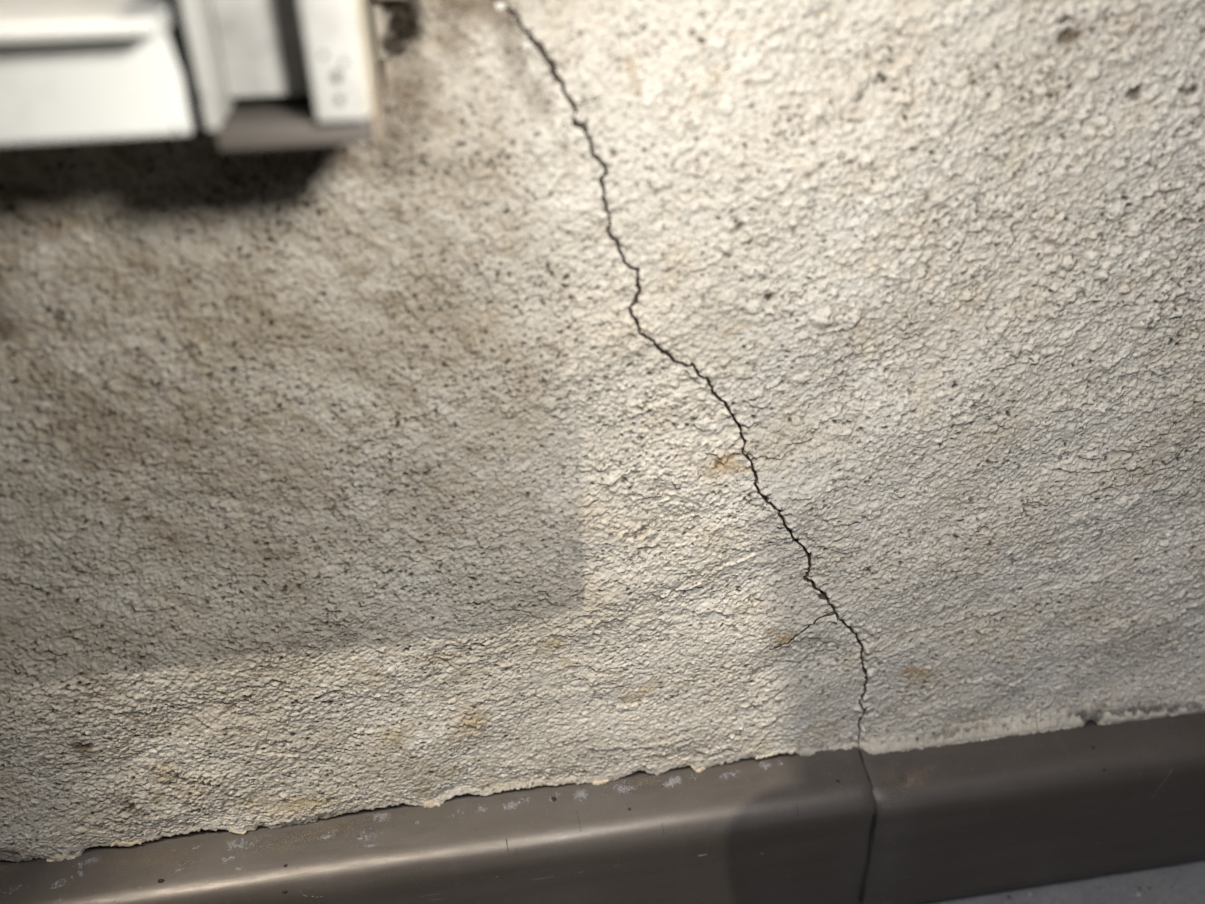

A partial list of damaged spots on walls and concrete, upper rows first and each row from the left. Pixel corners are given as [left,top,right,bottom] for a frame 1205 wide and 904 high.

crack [494,0,878,901]